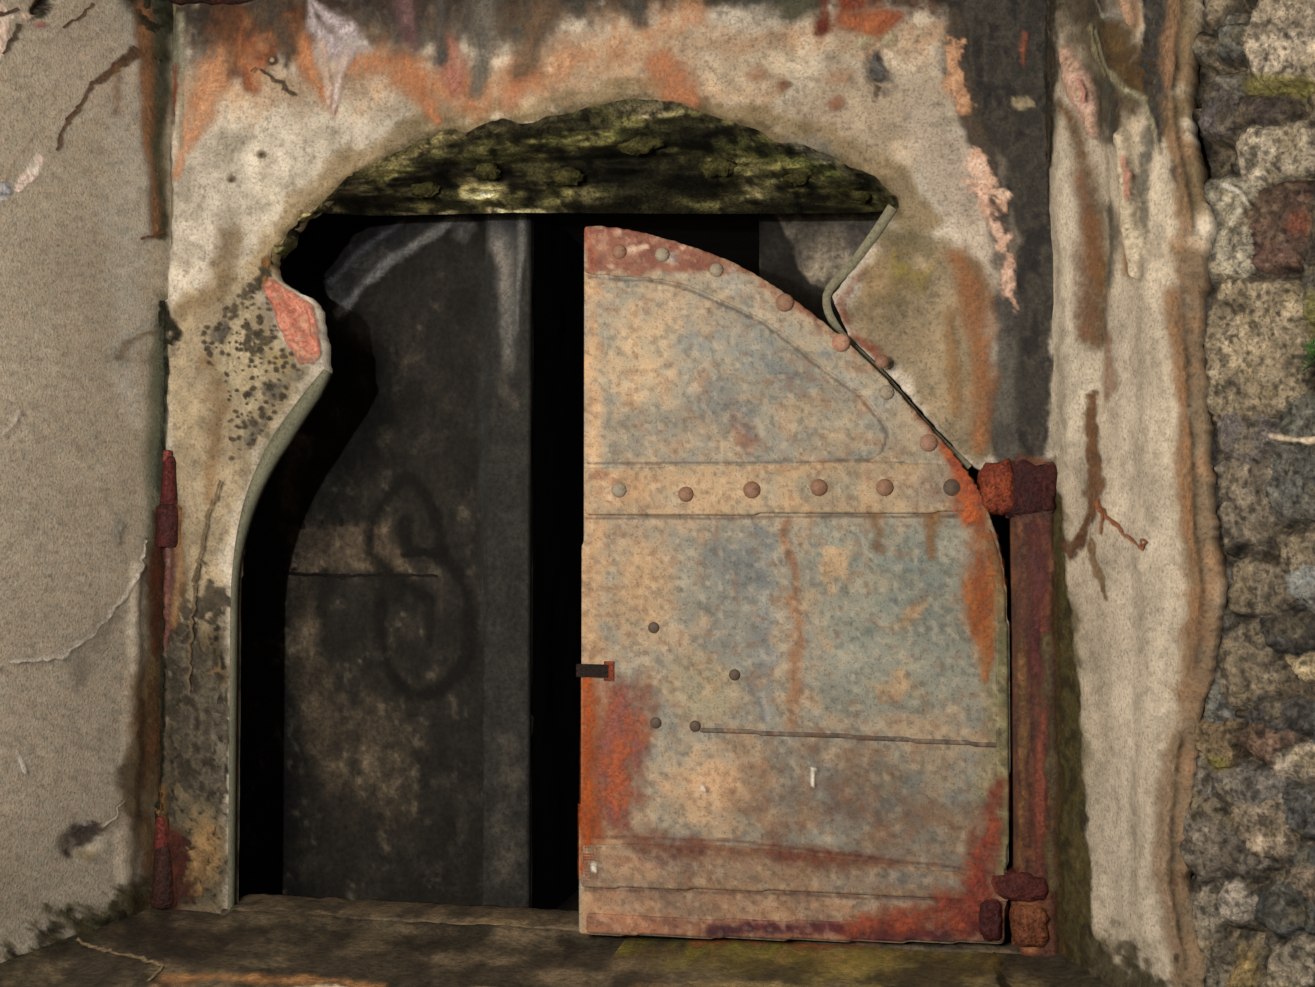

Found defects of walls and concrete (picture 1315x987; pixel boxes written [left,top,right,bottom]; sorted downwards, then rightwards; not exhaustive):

crack [0,45,143,201]
crack [62,2,94,28]
rust [172,11,337,179]
rust [346,0,704,124]
rust [814,0,903,39]
flaking render [942,36,971,115]
flaking render [1012,96,1035,110]
spalling [201,98,898,460]
flaking render [963,147,1018,309]
damp [944,0,1060,462]
rust [847,100,1129,957]
rust [579,677,649,875]